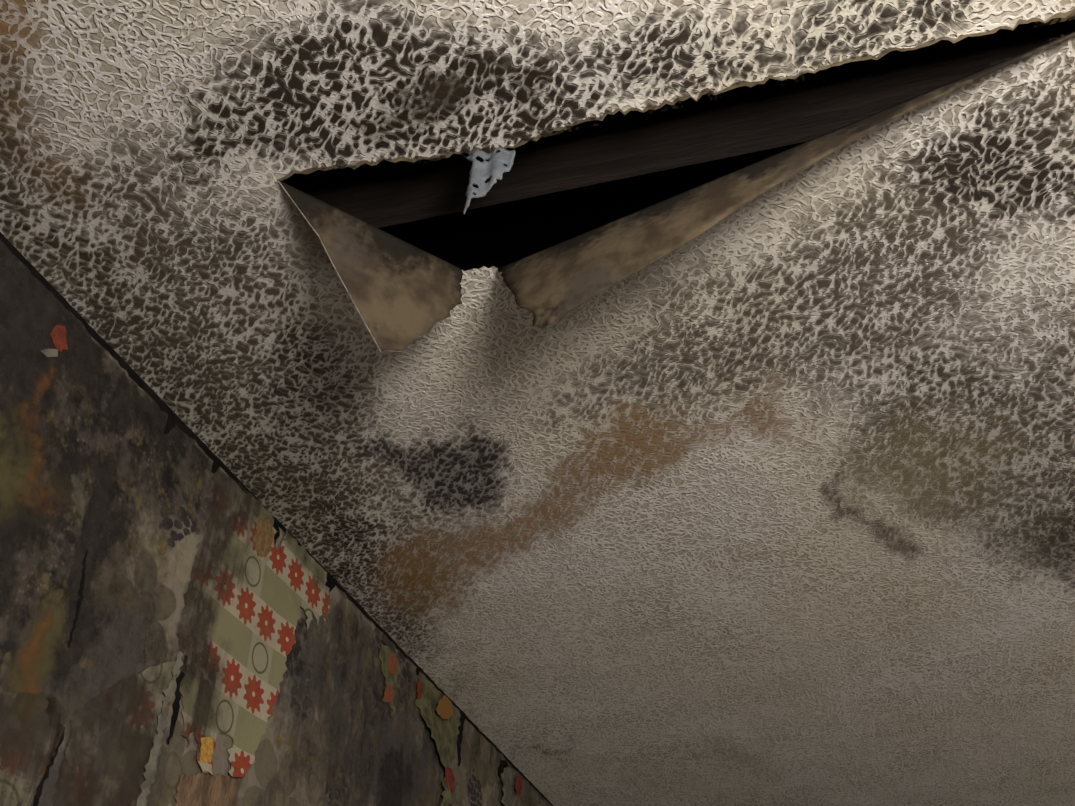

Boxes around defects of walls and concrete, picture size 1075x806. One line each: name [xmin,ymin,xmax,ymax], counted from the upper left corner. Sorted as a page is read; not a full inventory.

water stain [0,0,971,658]
water stain [555,57,1075,587]
peeling [0,693,95,806]
water stain [9,450,151,799]
peeling [101,475,330,806]
crack [0,232,553,806]
water stain [372,713,432,806]